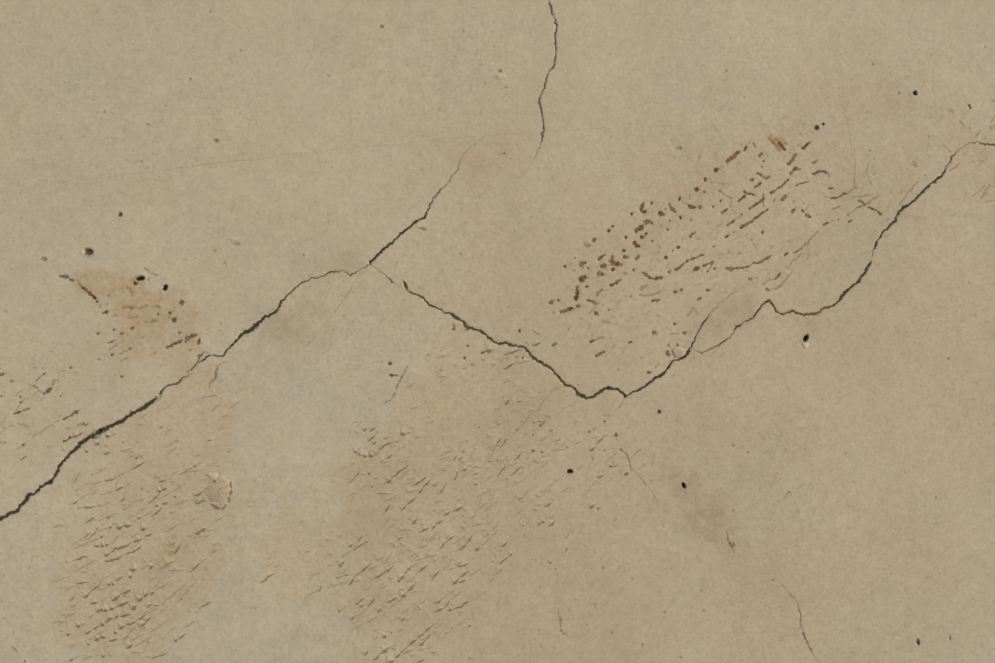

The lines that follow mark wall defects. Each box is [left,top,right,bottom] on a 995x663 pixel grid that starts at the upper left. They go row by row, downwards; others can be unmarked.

crack [0,136,995,522]
crack [512,0,558,190]
rust [548,132,788,323]
flaking render [538,115,889,387]
flaking render [0,343,245,663]